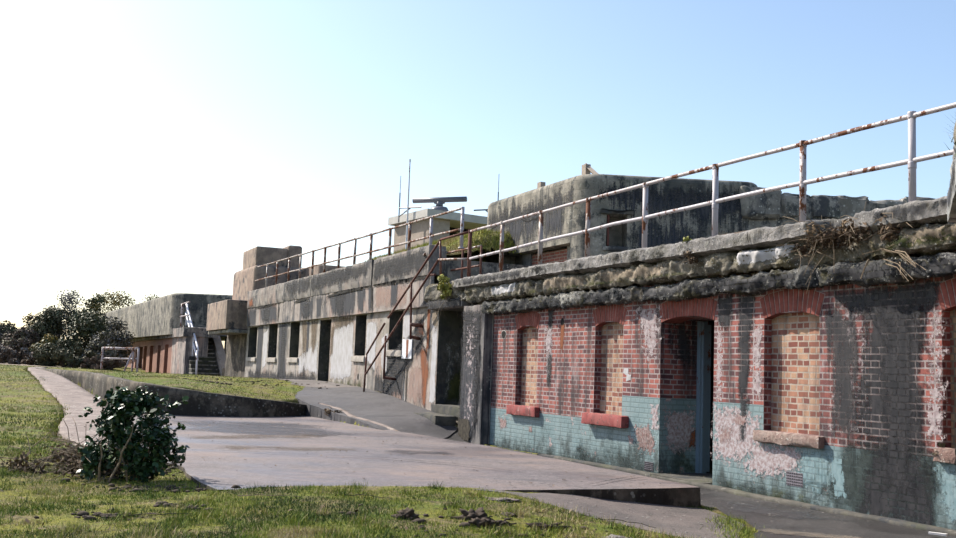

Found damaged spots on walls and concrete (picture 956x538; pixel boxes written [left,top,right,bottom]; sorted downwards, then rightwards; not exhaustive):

damp [489,186,573,246]
damp [594,178,749,249]
damp [248,305,316,380]
damp [285,250,482,437]
corrosion [406,309,431,407]
damp [511,272,796,441]
damp [820,254,956,525]
peeling [710,403,847,500]